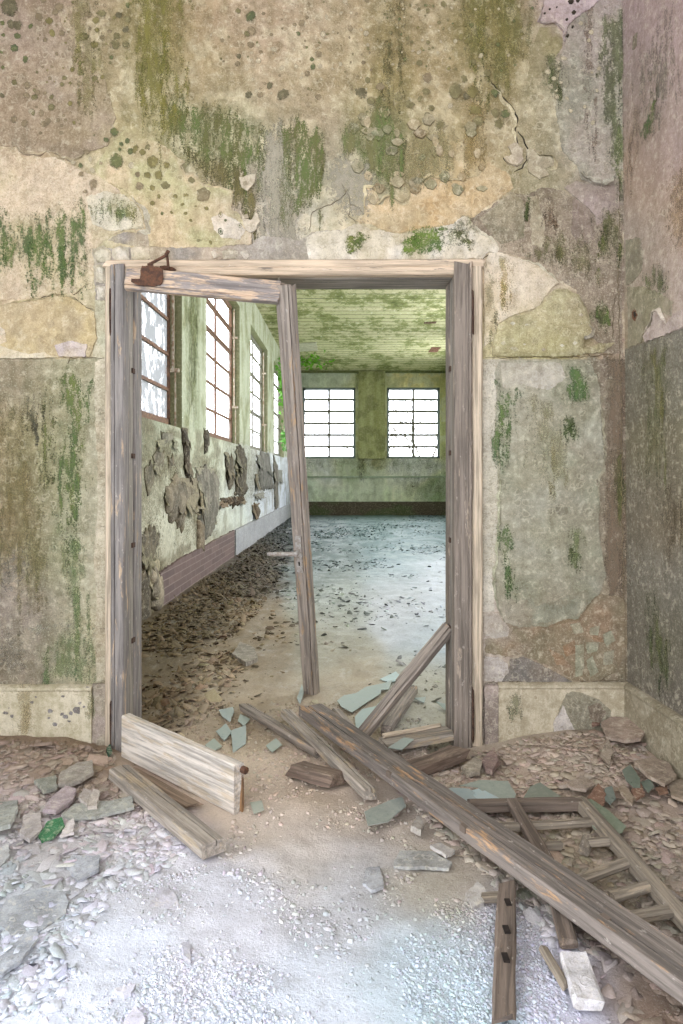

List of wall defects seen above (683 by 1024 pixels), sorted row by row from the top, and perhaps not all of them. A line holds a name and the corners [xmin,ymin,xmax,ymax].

water stain [158,29,168,175]
crack [489,82,528,172]
water stain [227,120,306,241]
water stain [27,238,75,303]
flaking render [0,0,683,745]
water stain [498,406,511,467]
water stain [21,396,80,574]
water stain [504,558,518,603]
water stain [29,586,91,675]